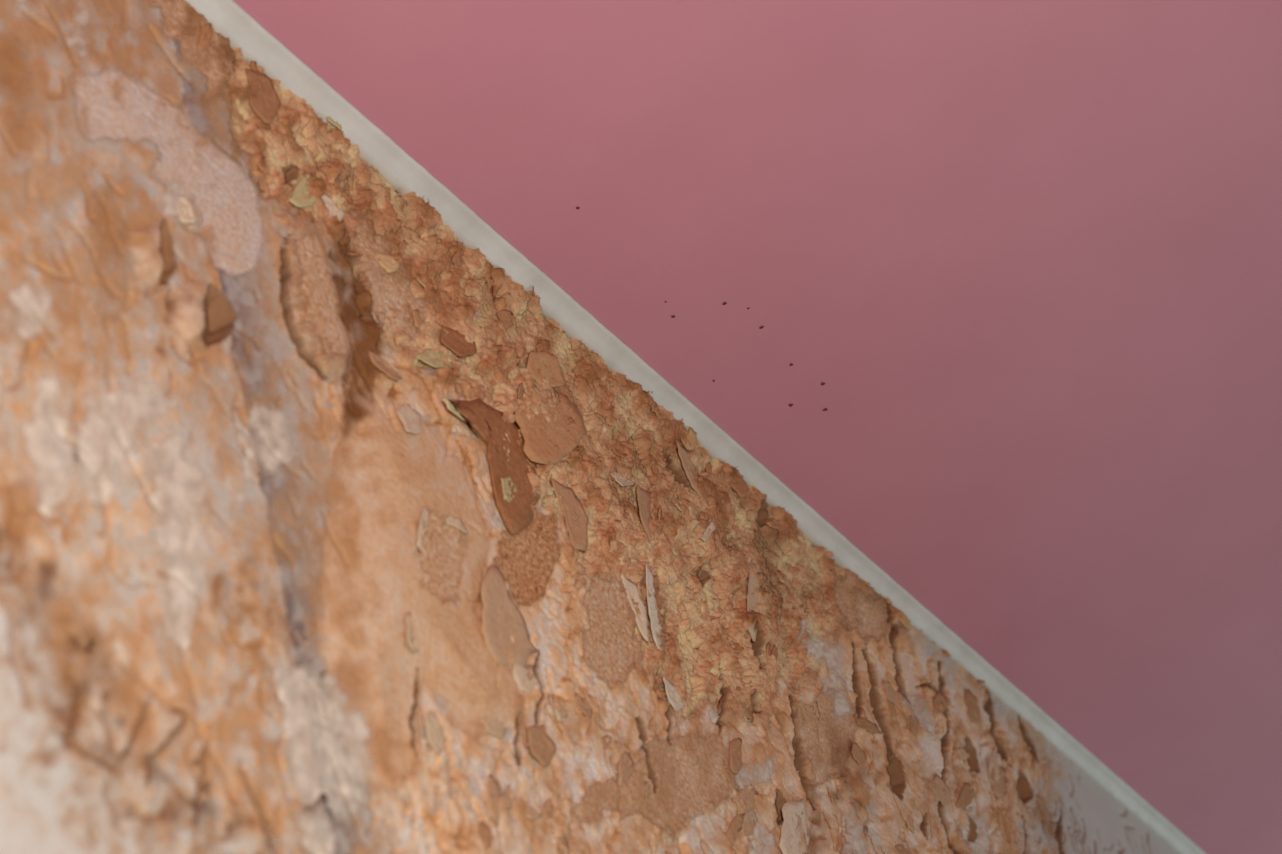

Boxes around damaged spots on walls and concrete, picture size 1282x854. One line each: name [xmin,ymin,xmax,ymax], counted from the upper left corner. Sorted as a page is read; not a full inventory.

water stain [0,0,204,156]
water stain [0,146,186,367]
water stain [0,377,179,539]
water stain [212,389,307,509]
spalling [224,48,1063,854]
water stain [52,434,390,854]